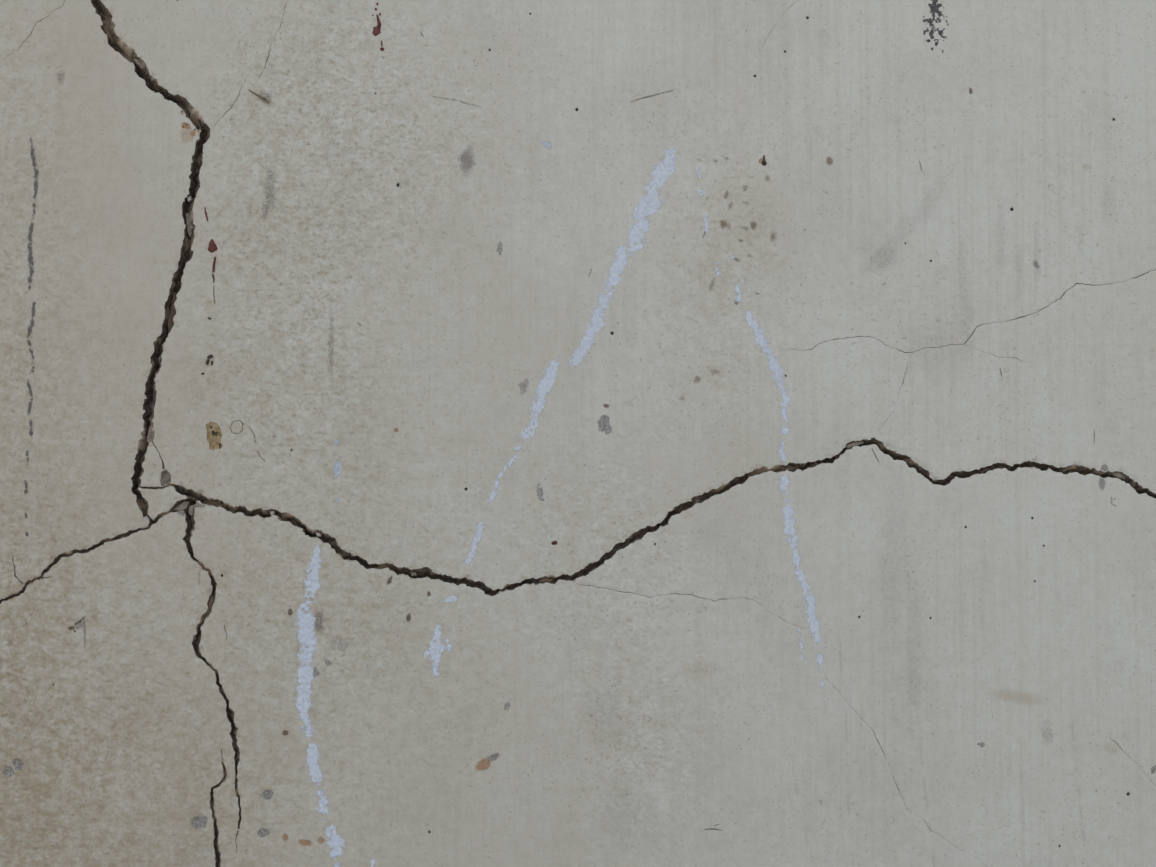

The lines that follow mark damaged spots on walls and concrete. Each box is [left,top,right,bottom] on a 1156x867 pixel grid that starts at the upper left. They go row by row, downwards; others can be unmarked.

crack [808,283,1094,384]
crack [0,0,241,867]
crack [169,438,1156,596]